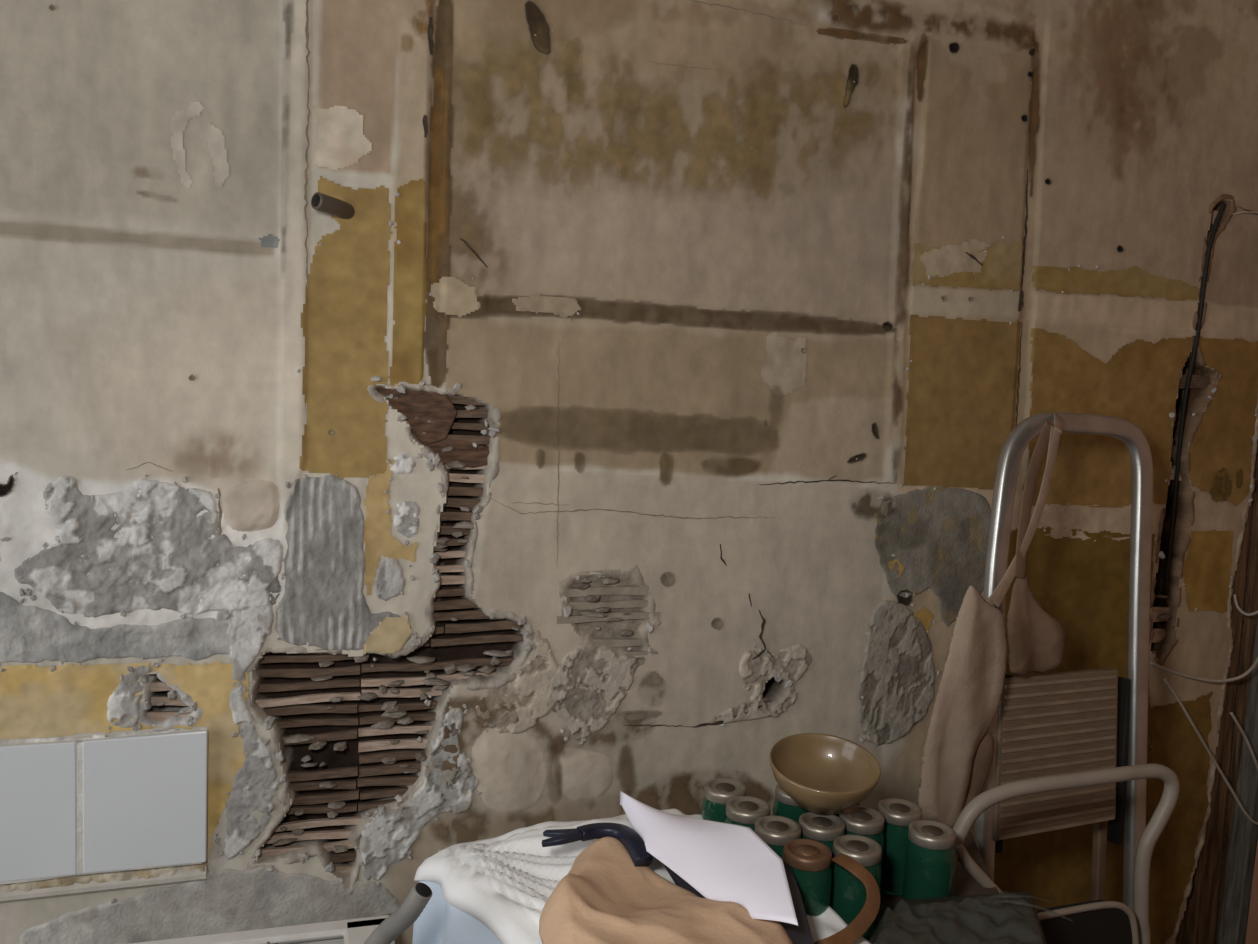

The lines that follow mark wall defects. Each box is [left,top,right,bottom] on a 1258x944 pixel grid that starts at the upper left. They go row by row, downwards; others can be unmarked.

leakage [452,53,871,194]
flaking render [0,176,645,895]
flaking render [709,644,815,727]
peeling [859,194,1258,944]